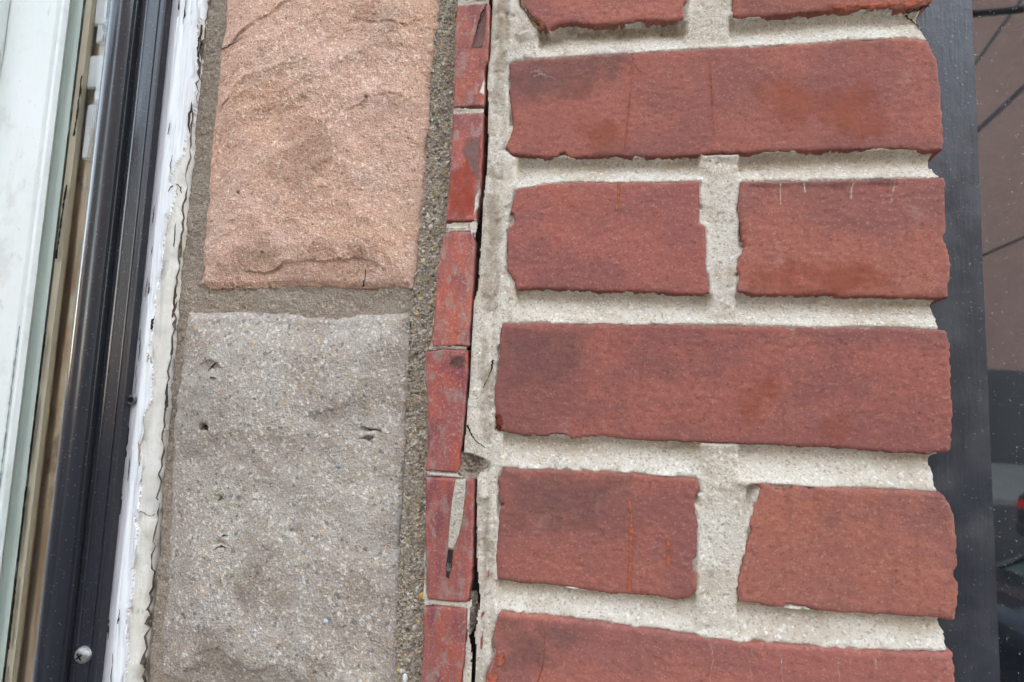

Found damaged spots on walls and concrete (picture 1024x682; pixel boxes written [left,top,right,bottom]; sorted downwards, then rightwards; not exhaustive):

crack [476,82,489,295]
peeling [119,101,199,682]
crack [470,558,481,682]